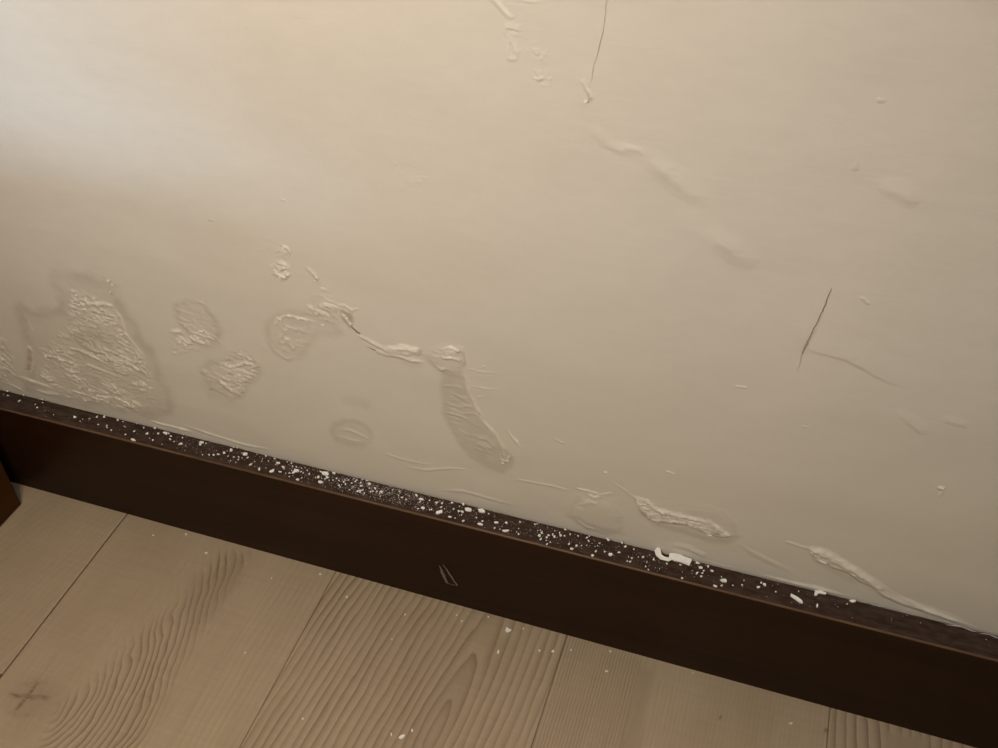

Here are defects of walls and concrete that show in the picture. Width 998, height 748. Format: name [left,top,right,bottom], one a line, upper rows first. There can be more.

crack [591,0,607,82]